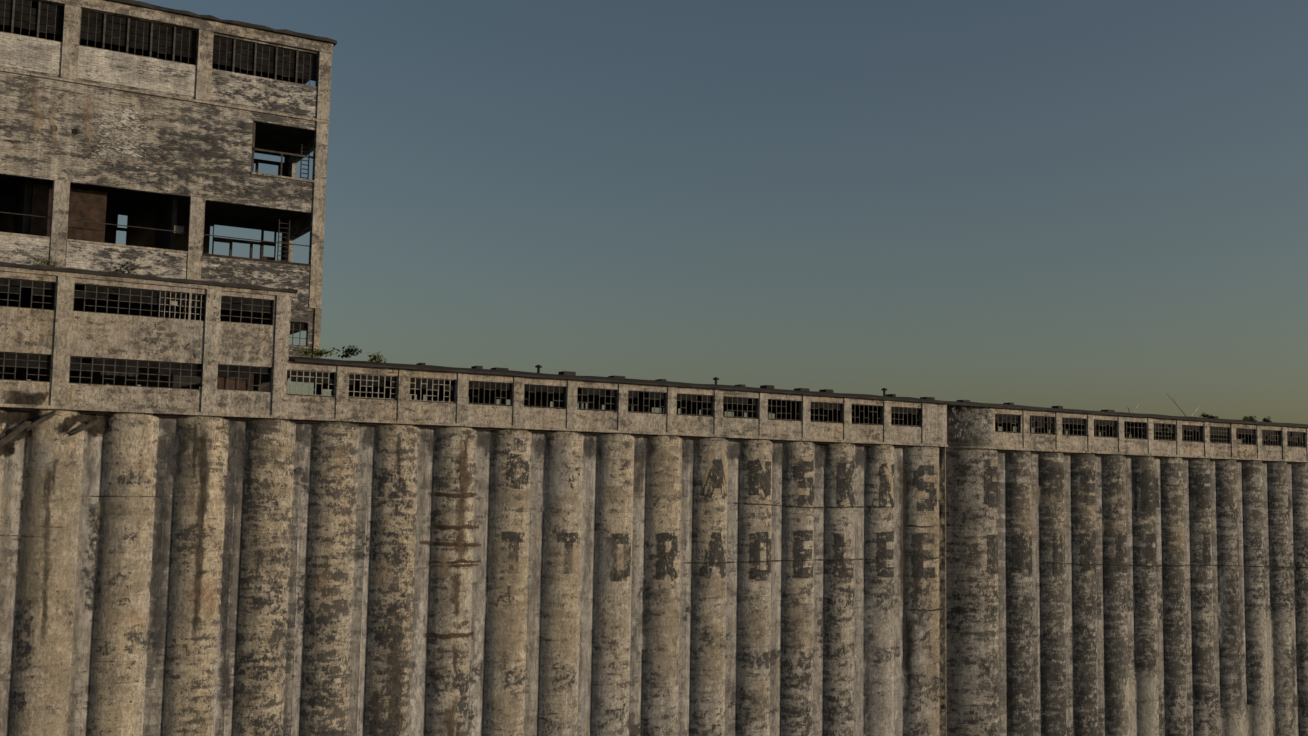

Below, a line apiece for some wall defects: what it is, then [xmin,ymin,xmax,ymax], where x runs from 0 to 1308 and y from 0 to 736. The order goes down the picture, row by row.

rust [421,524,482,568]
damp [150,420,258,734]
peeling [9,598,38,674]
rust [422,631,478,639]
peeling [9,691,27,721]